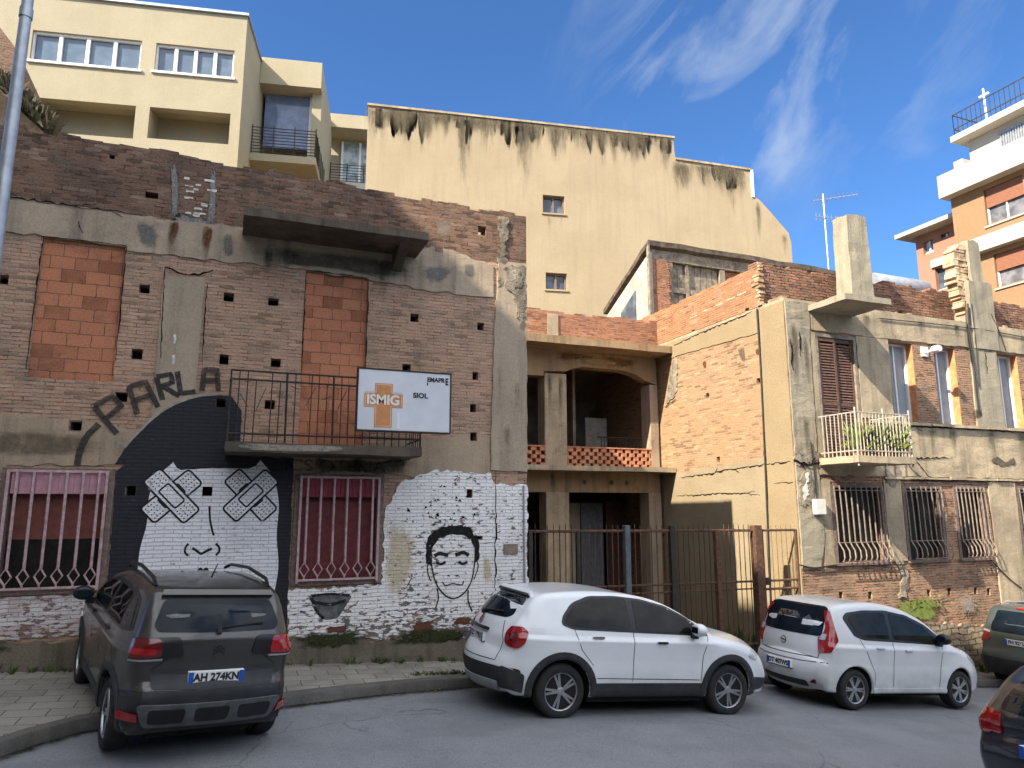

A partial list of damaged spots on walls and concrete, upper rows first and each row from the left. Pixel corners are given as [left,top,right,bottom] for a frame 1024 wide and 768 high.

damp [369,110,645,155]
spalling [170,160,217,225]
damp [674,163,686,181]
damp [700,165,742,188]
damp [139,224,156,244]
spalling [496,216,527,328]
crack [679,457,820,497]
spalling [793,448,820,507]
peeling [406,479,488,526]
peeling [412,621,434,631]
peeling [440,617,471,643]